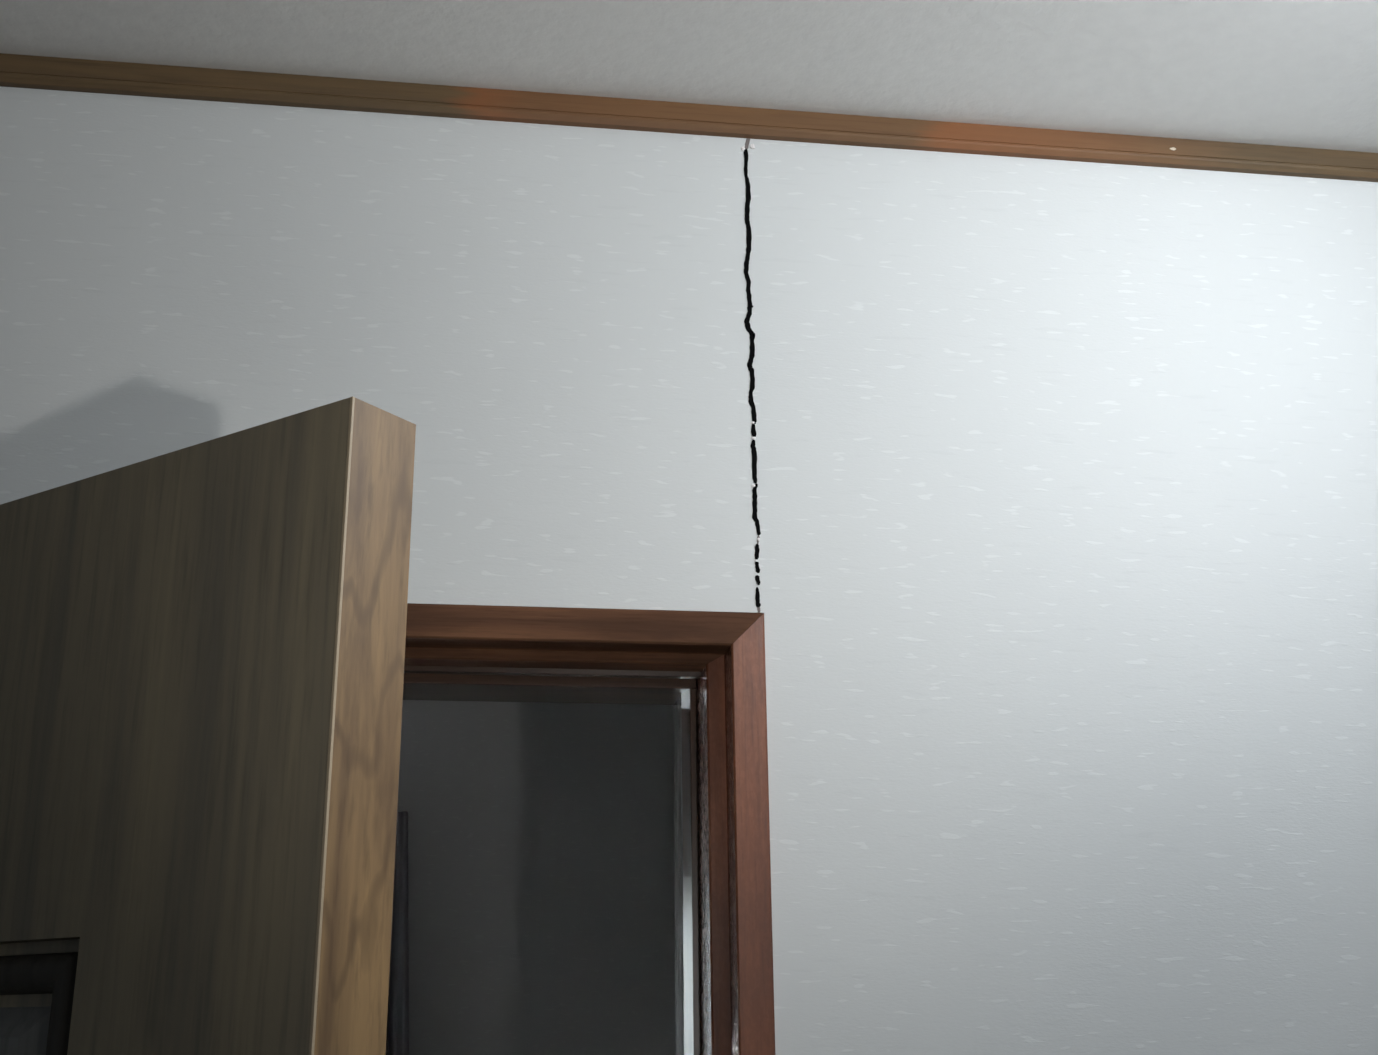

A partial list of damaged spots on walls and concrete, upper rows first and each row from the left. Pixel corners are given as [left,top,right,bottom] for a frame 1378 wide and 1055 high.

crack [741,138,761,612]